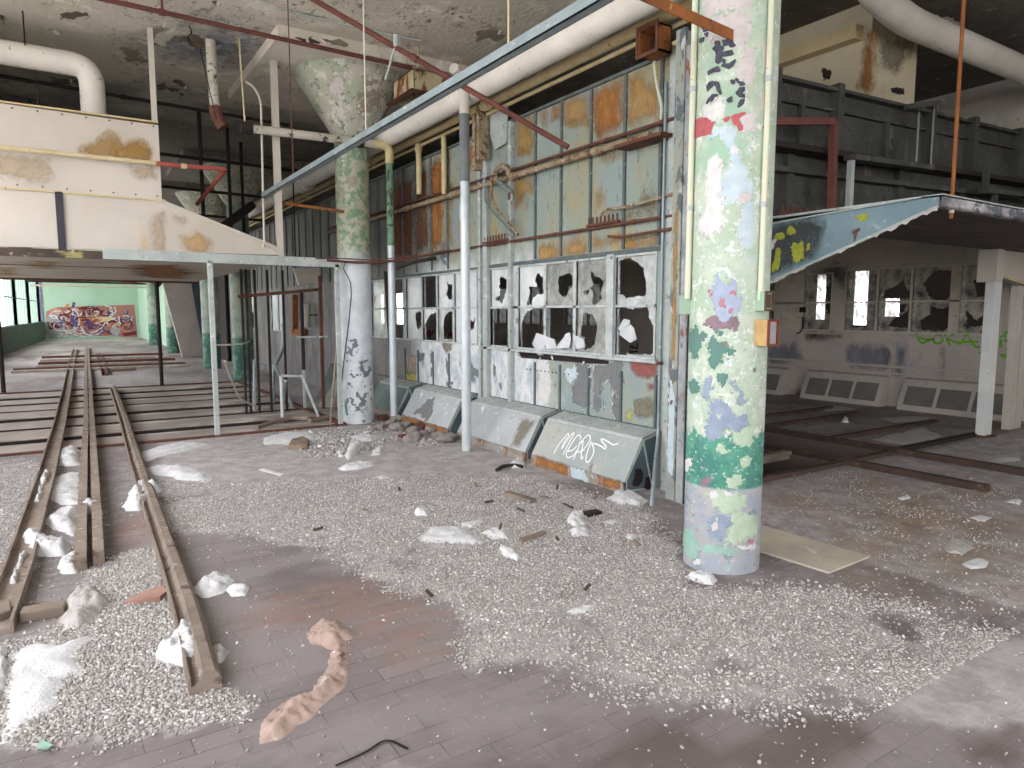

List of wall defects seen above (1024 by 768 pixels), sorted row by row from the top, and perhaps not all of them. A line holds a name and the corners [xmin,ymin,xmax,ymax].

corrosion [857,31,912,91]
peeling [330,75,384,120]
corrosion [516,75,657,154]
peeling [697,0,767,251]
corrosion [627,195,657,218]
corrosion [539,238,605,259]
peeling [345,339,372,415]
peeling [537,356,553,404]
peeling [564,360,625,421]
peeling [683,273,759,565]
corrosion [536,456,567,475]
corrosion [603,479,620,489]